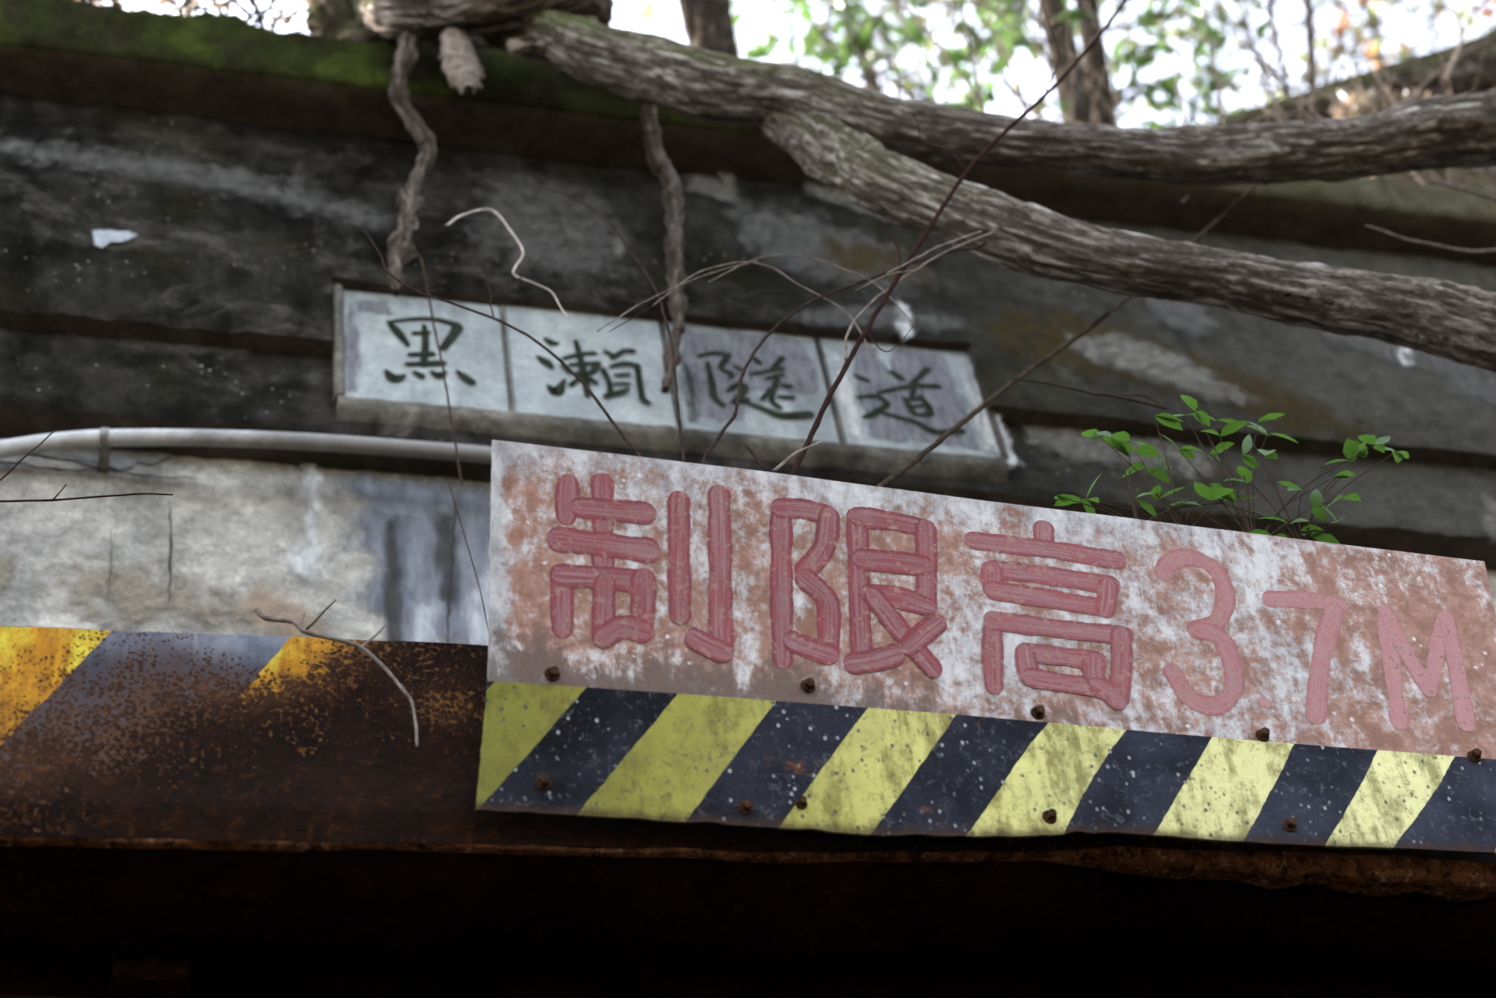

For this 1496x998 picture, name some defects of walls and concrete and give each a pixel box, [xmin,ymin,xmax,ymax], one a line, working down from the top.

water stain [0,139,390,228]
water stain [287,464,491,646]